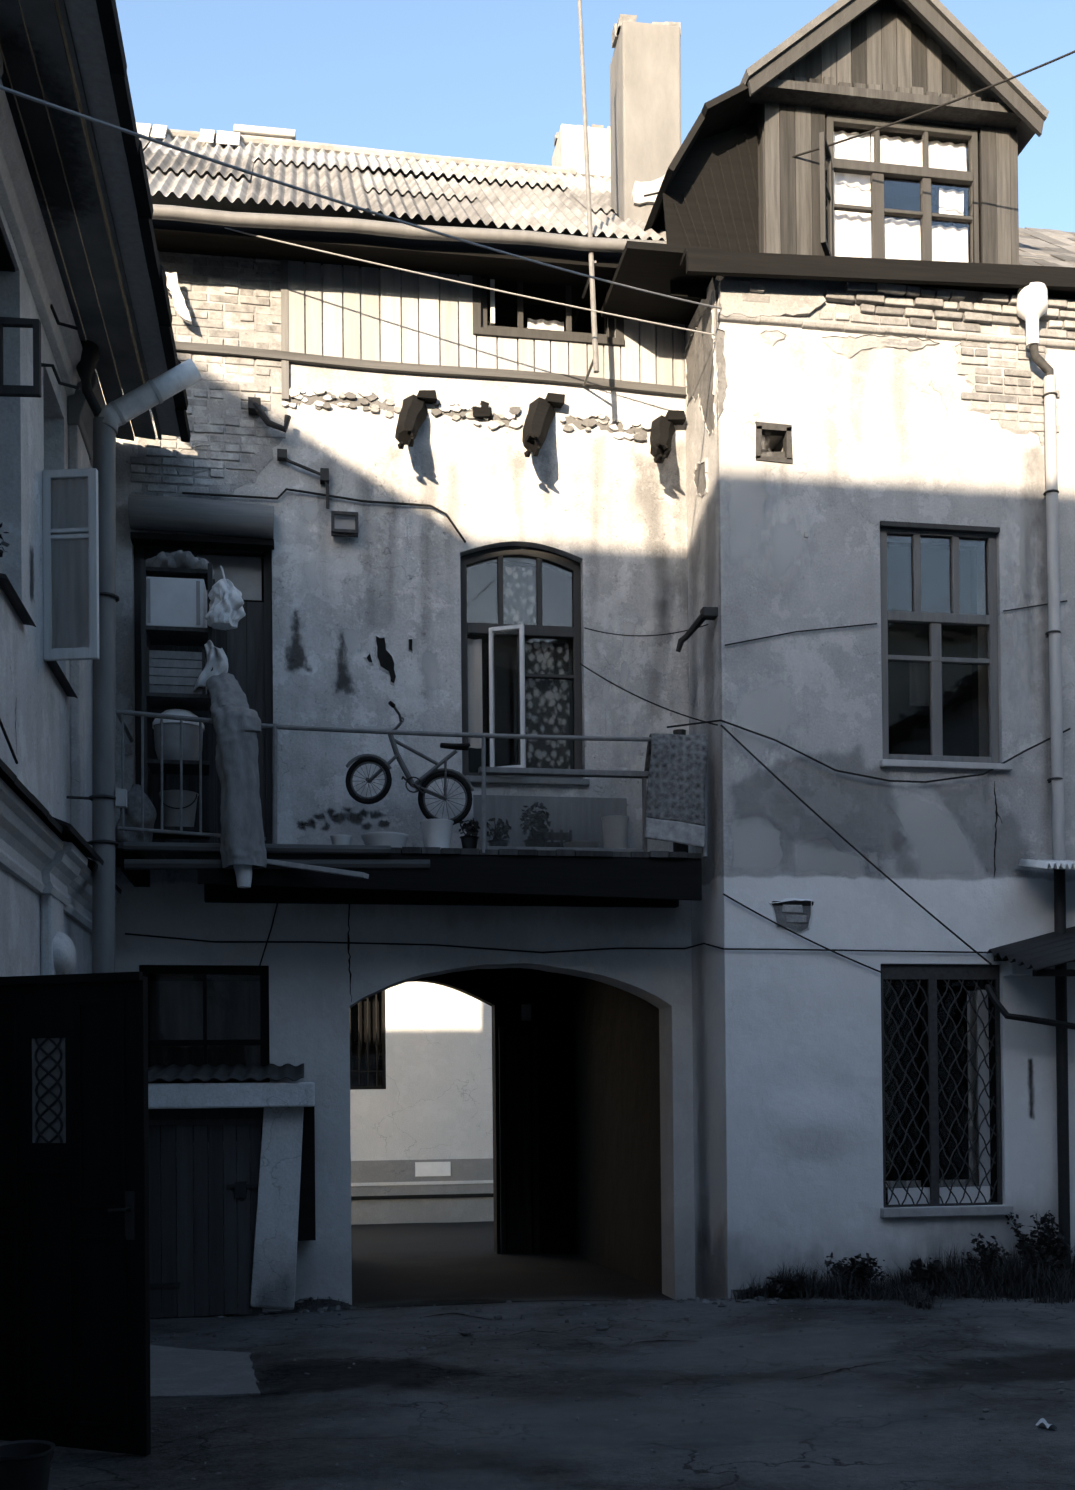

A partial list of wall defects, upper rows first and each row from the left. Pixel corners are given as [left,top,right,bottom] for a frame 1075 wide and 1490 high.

spalling [819,332,1060,446]
water stain [286,611,310,671]
water stain [336,635,351,693]
crack [994,781,1002,876]